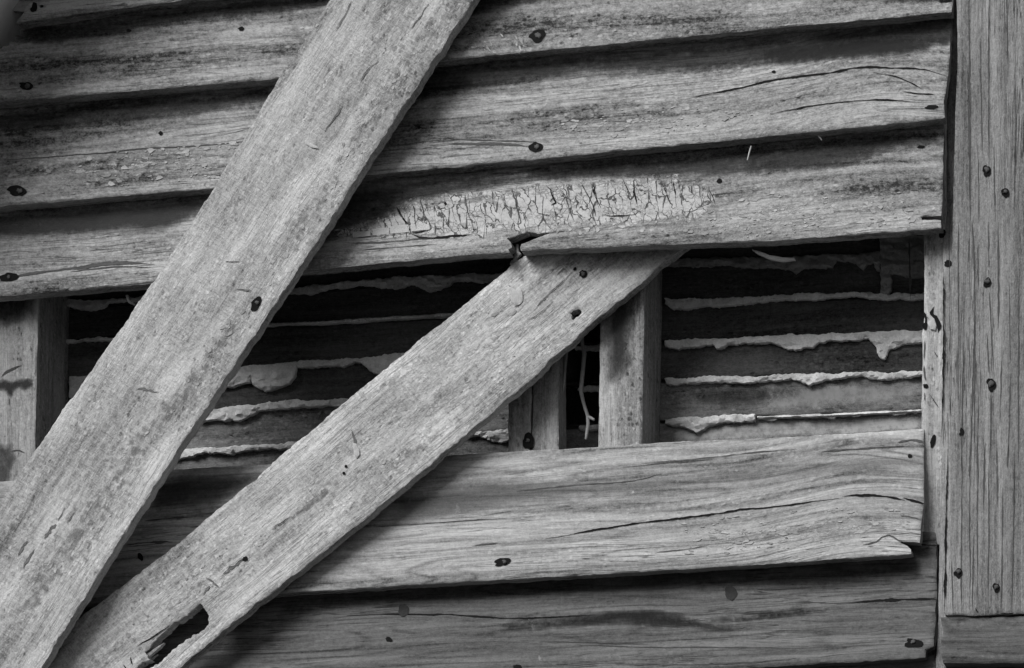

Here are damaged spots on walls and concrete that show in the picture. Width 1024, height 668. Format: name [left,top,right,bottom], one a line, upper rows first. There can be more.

crack [373,518,500,546]
crack [522,2,1019,646]